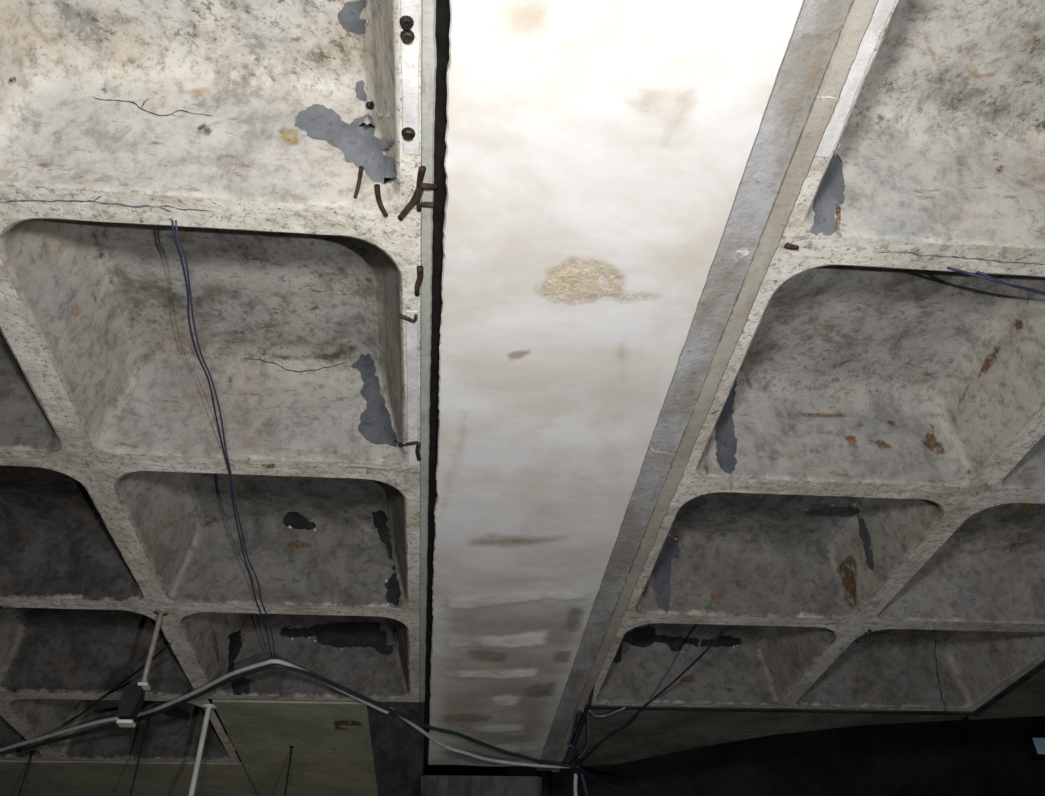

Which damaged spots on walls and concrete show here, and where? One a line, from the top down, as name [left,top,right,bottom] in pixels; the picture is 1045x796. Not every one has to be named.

peeling [335,0,384,34]
crack [92,96,211,116]
peeling [295,80,401,195]
peeling [806,144,845,235]
leakage [541,260,646,303]
peeling [351,352,398,447]
peeling [715,364,743,474]
rust [922,424,944,453]
peeling [674,496,707,523]
peeling [652,535,680,612]
rust [837,556,857,608]
peeling [613,626,742,663]